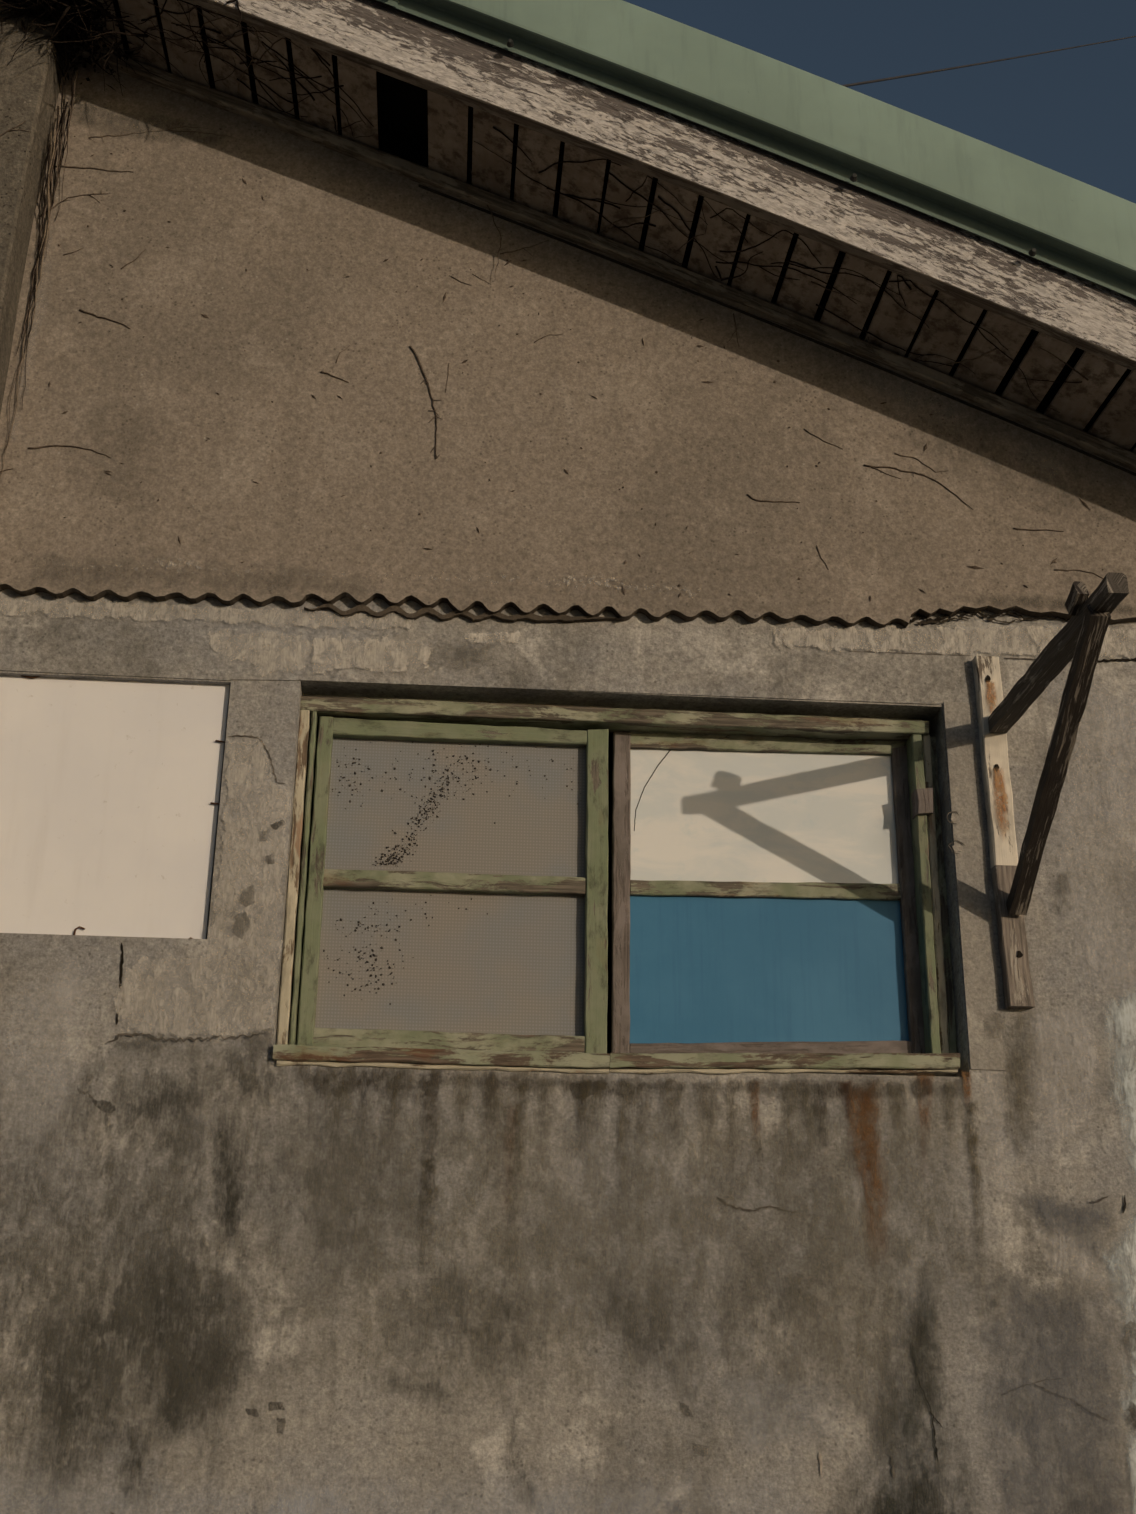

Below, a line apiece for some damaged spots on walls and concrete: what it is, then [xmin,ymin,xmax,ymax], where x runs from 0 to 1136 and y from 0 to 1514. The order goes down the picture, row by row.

crack [116,943,126,1025]
water stain [0,1087,264,1470]
water stain [301,1066,955,1345]
water stain [872,1301,965,1514]